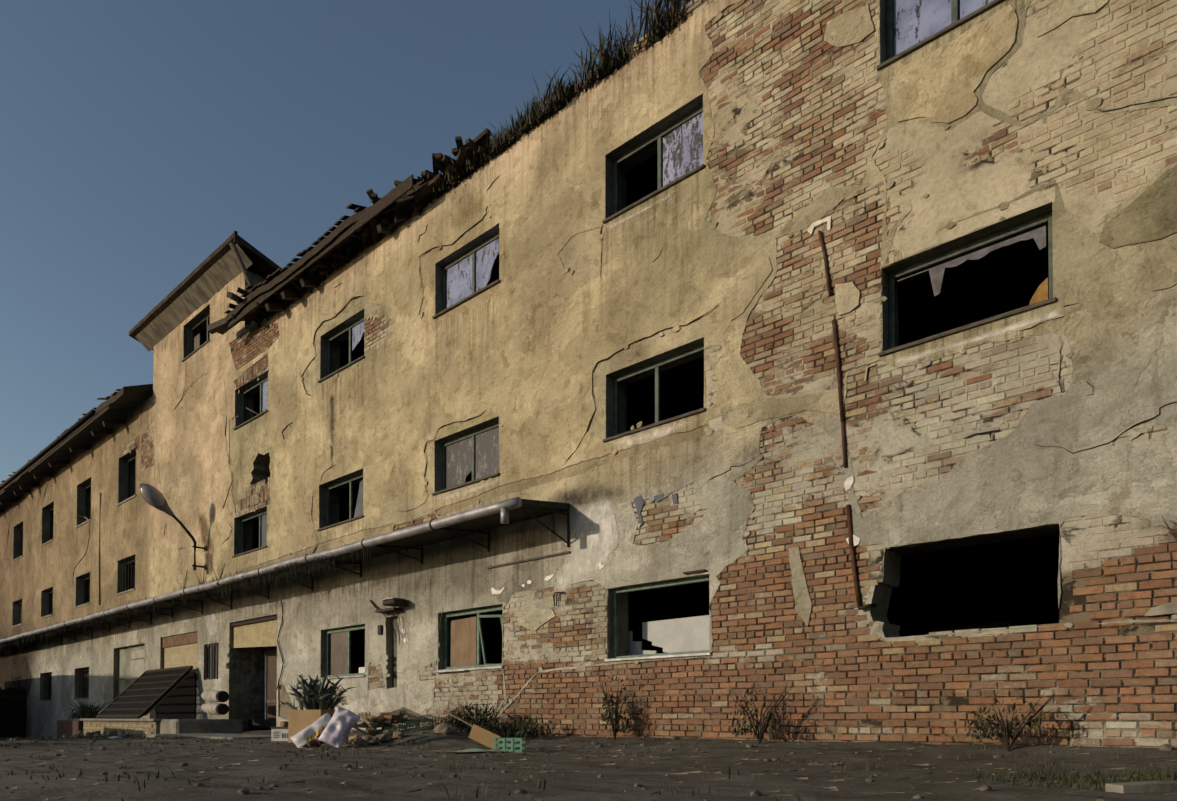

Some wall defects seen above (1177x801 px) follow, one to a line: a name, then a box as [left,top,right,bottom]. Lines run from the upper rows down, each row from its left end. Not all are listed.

crack [418,175,500,322]
flaking render [229,323,280,393]
peeling [247,296,724,571]
crack [563,304,719,465]
flaking render [327,0,1177,748]
crack [1033,400,1177,454]